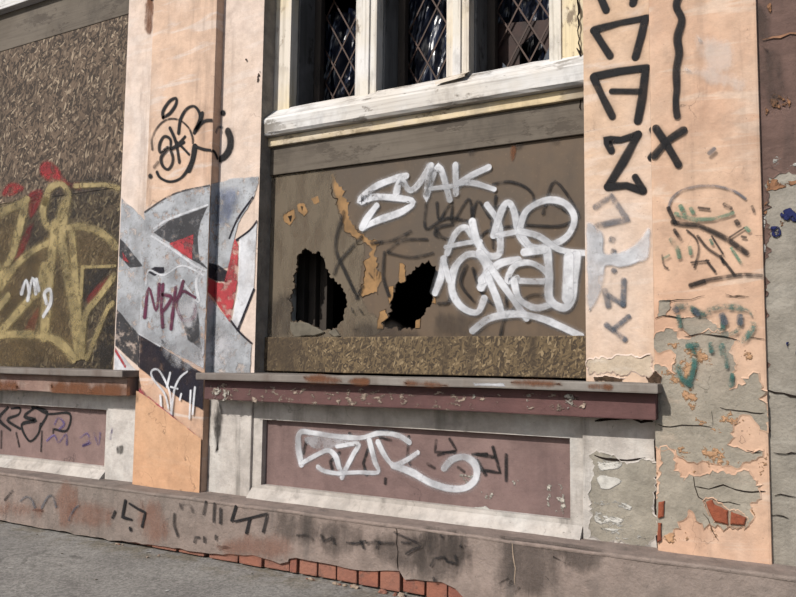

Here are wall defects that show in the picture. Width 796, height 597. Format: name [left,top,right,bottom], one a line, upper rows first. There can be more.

peeling [267,170,381,337]
flaking render [585,163,796,566]
crack [768,390,796,398]
flaking render [125,541,462,597]